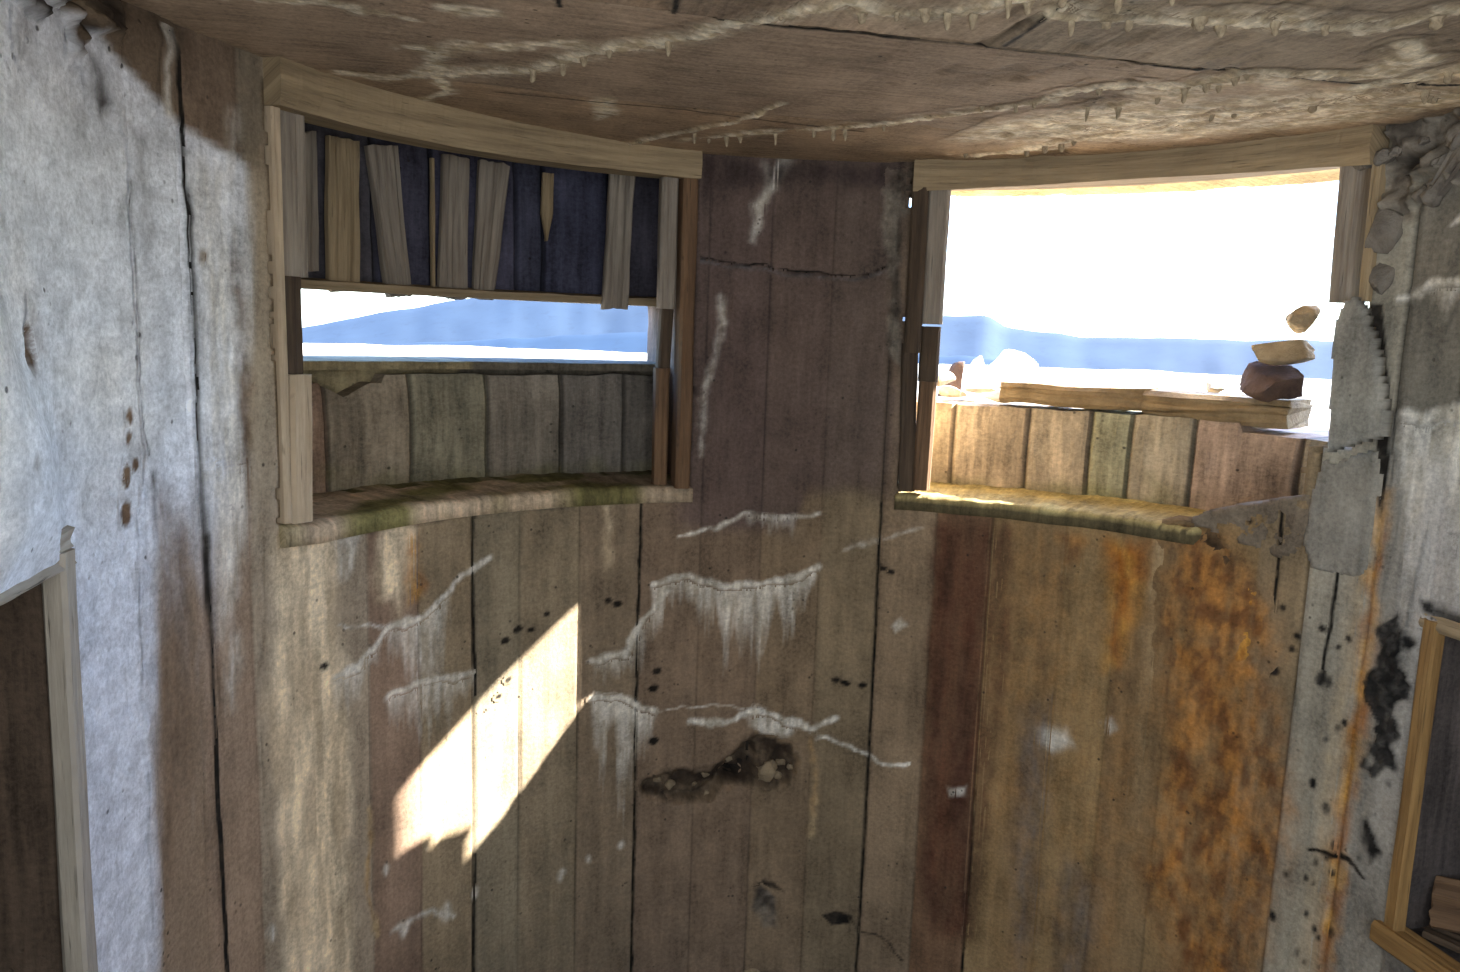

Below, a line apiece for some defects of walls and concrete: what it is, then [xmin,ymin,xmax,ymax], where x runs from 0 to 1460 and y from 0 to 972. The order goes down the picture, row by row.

spalling [8,0,128,79]
water stain [81,20,181,275]
water stain [206,0,1460,247]
water stain [695,289,732,462]
spalling [1303,108,1460,576]
water stain [1392,273,1460,331]
water stain [136,98,495,972]
water stain [594,504,621,576]
spalling [633,730,801,809]
water stain [584,561,912,852]
corrosion [909,514,1312,972]
water stain [1262,397,1460,972]